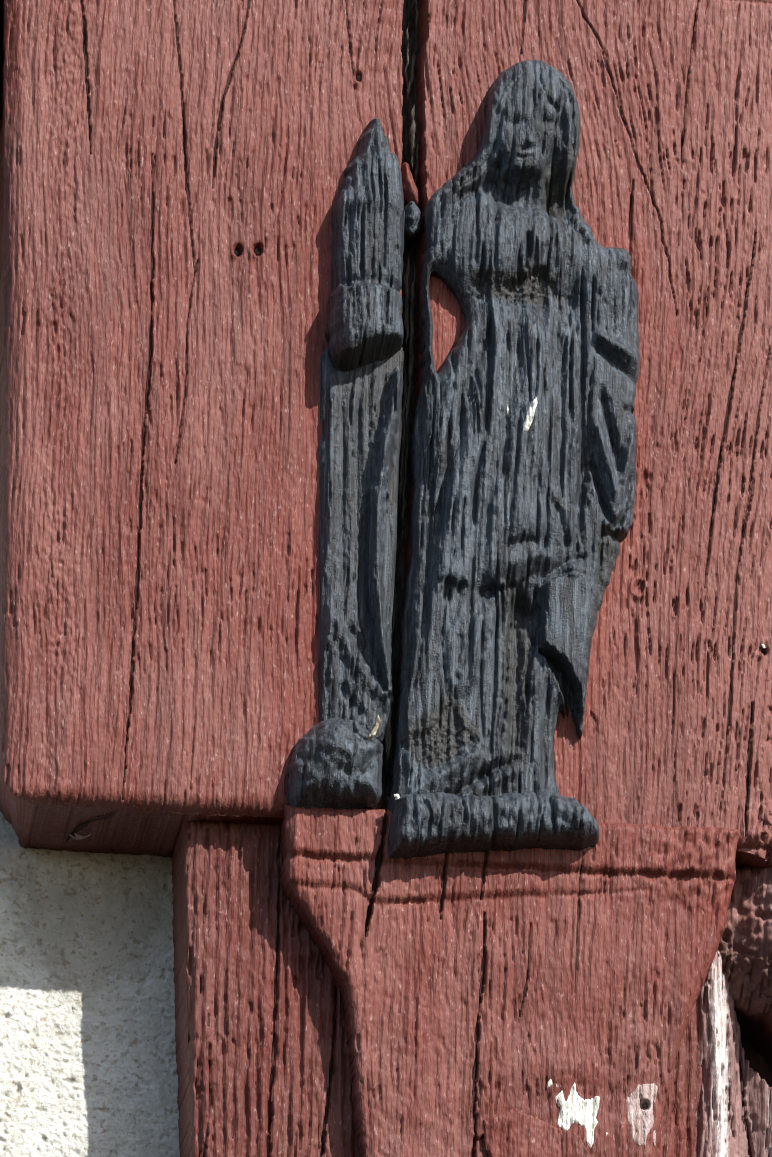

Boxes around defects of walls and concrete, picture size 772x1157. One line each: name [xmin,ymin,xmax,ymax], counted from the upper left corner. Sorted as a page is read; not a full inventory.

crack [81,0,91,154]
crack [173,0,249,464]
crack [401,0,420,189]
crack [577,1,676,309]
crack [66,166,153,843]
crack [365,238,418,934]
crack [321,989,337,1157]
crack [471,852,487,1157]
peeling [483,1079,608,1157]
peeling [627,1083,658,1146]